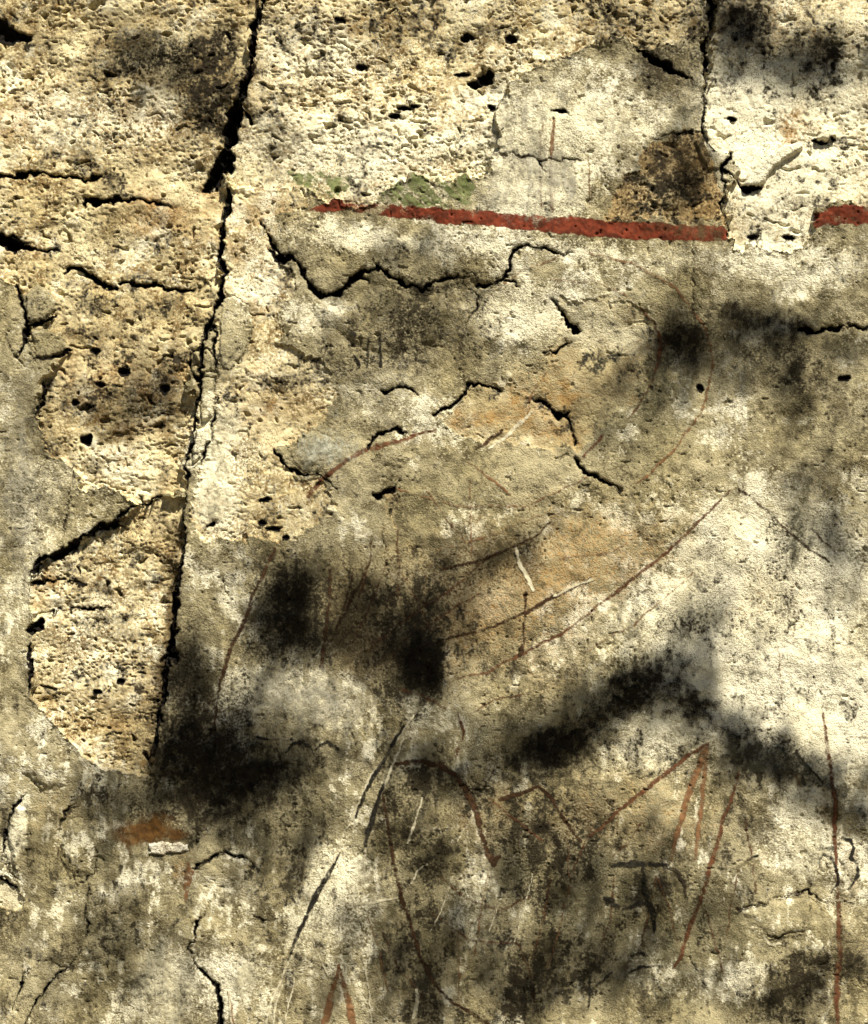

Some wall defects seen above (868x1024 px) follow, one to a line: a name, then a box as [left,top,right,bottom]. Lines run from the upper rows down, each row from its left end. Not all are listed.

crack [637,0,762,237]
crack [260,222,568,348]
crack [0,0,266,757]
crack [367,427,407,450]
spalling [0,0,868,780]
crack [433,381,501,416]
crack [535,399,621,493]
water stain [636,325,701,410]
mould [719,300,809,396]
efflorescence [243,662,364,731]
water stain [722,731,850,799]
crack [187,918,223,1024]